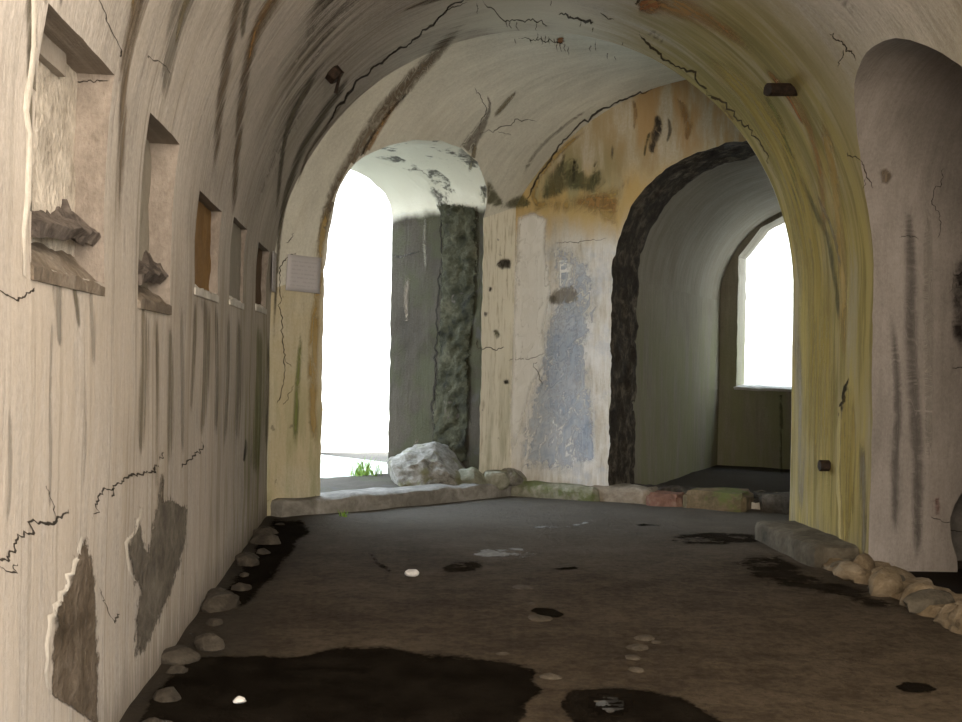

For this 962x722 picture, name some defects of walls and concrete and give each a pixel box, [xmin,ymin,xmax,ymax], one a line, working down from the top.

crack [331,0,769,163]
crack [527,89,652,199]
crack [0,288,34,302]
peeling [511,214,593,467]
water stain [952,263,962,342]
crack [0,487,69,573]
crack [94,444,204,514]
spalling [124,479,188,656]
spalling [44,536,99,722]